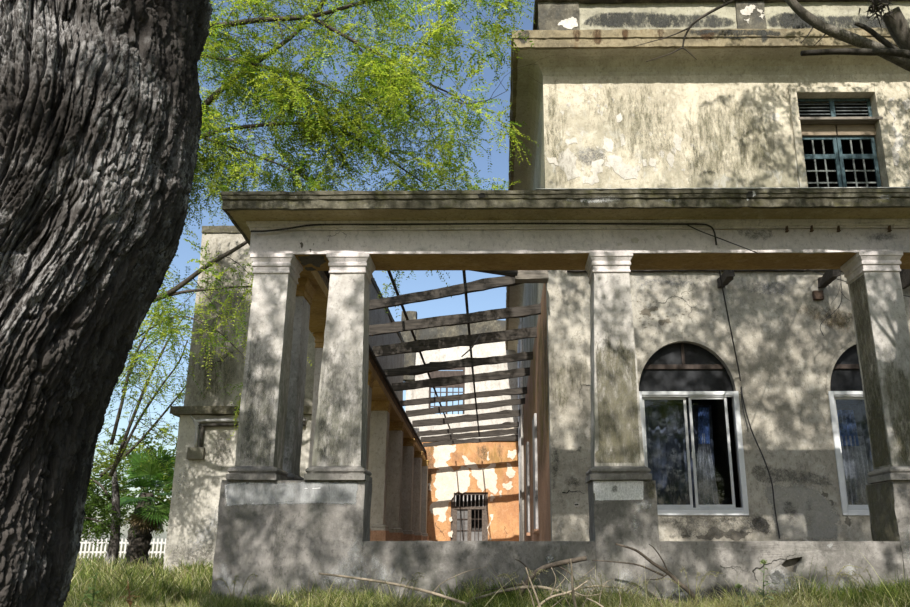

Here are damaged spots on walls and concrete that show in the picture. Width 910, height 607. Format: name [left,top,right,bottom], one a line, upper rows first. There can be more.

water stain [584,12,886,42]
peeling [740,5,765,24]
water stain [599,91,661,152]
water stain [688,99,776,175]
peeling [428,445,516,538]